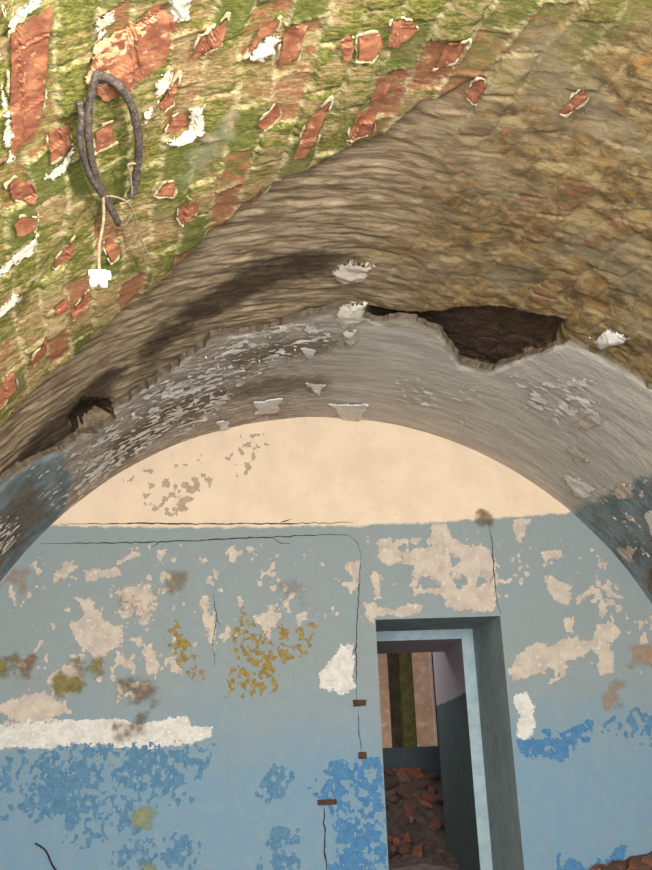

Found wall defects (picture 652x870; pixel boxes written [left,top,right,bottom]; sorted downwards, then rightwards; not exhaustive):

spalling [85,4,179,102]
spalling [339,16,419,64]
spalling [365,305,563,364]
peeling [38,323,338,509]
peeling [7,544,185,612]
peeling [334,518,652,684]
peeling [319,643,356,695]
peeling [0,596,216,870]
peeling [513,691,652,762]
crack [321,809,329,870]
peeling [308,757,443,870]
peeling [556,843,652,870]